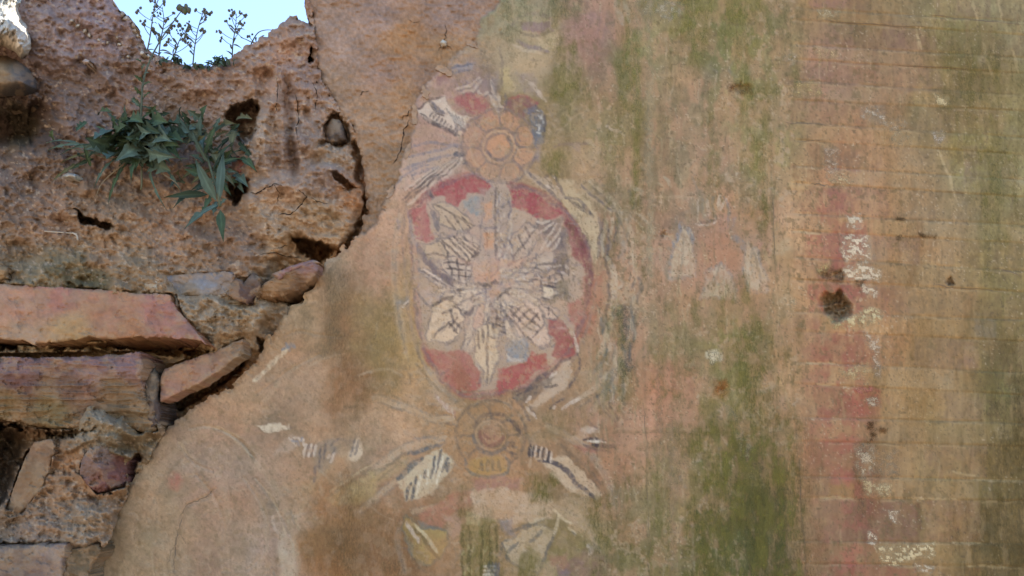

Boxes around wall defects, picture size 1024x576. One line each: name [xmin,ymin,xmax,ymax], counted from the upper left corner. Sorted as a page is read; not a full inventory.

damp [830,216,882,406]
damp [684,414,803,576]
efflorescence [856,447,898,497]
efflorescence [869,534,934,572]